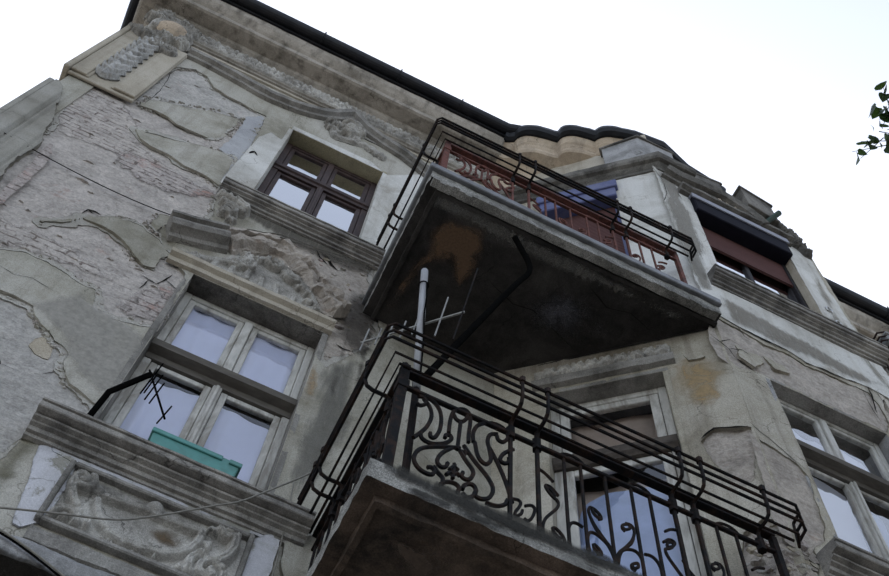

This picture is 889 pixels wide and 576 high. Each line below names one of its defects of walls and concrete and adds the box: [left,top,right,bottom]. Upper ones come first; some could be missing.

flaking render [0,68,266,331]
rust [399,222,481,291]
flaking render [0,283,101,459]
leakage [296,366,348,480]
crack [710,319,787,362]
crack [703,422,803,467]
crack [806,362,882,420]
flaking render [703,430,824,576]